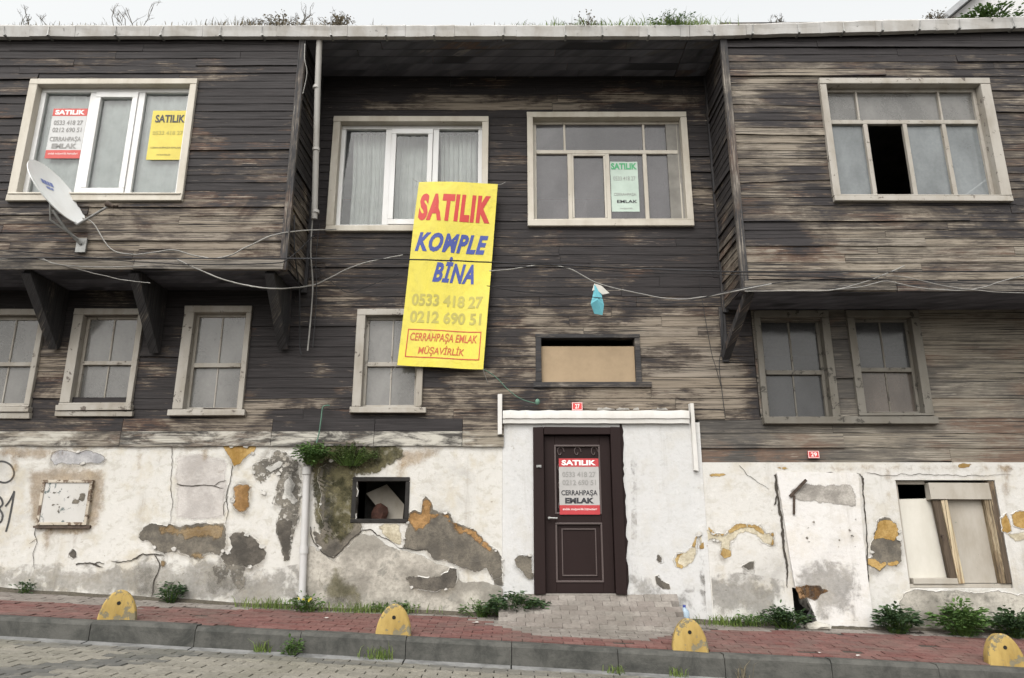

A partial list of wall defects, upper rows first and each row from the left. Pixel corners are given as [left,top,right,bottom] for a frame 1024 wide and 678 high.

peeling [50,449,107,465]
crack [76,553,164,597]
crack [170,456,233,524]
flaking render [139,521,266,589]
peeling [223,446,303,561]
leakage [306,446,403,543]
flaking render [379,495,534,593]
peeling [655,523,775,590]
crack [739,465,788,588]
spalling [792,585,828,623]
peeling [866,516,902,571]
peeling [1000,509,1024,541]